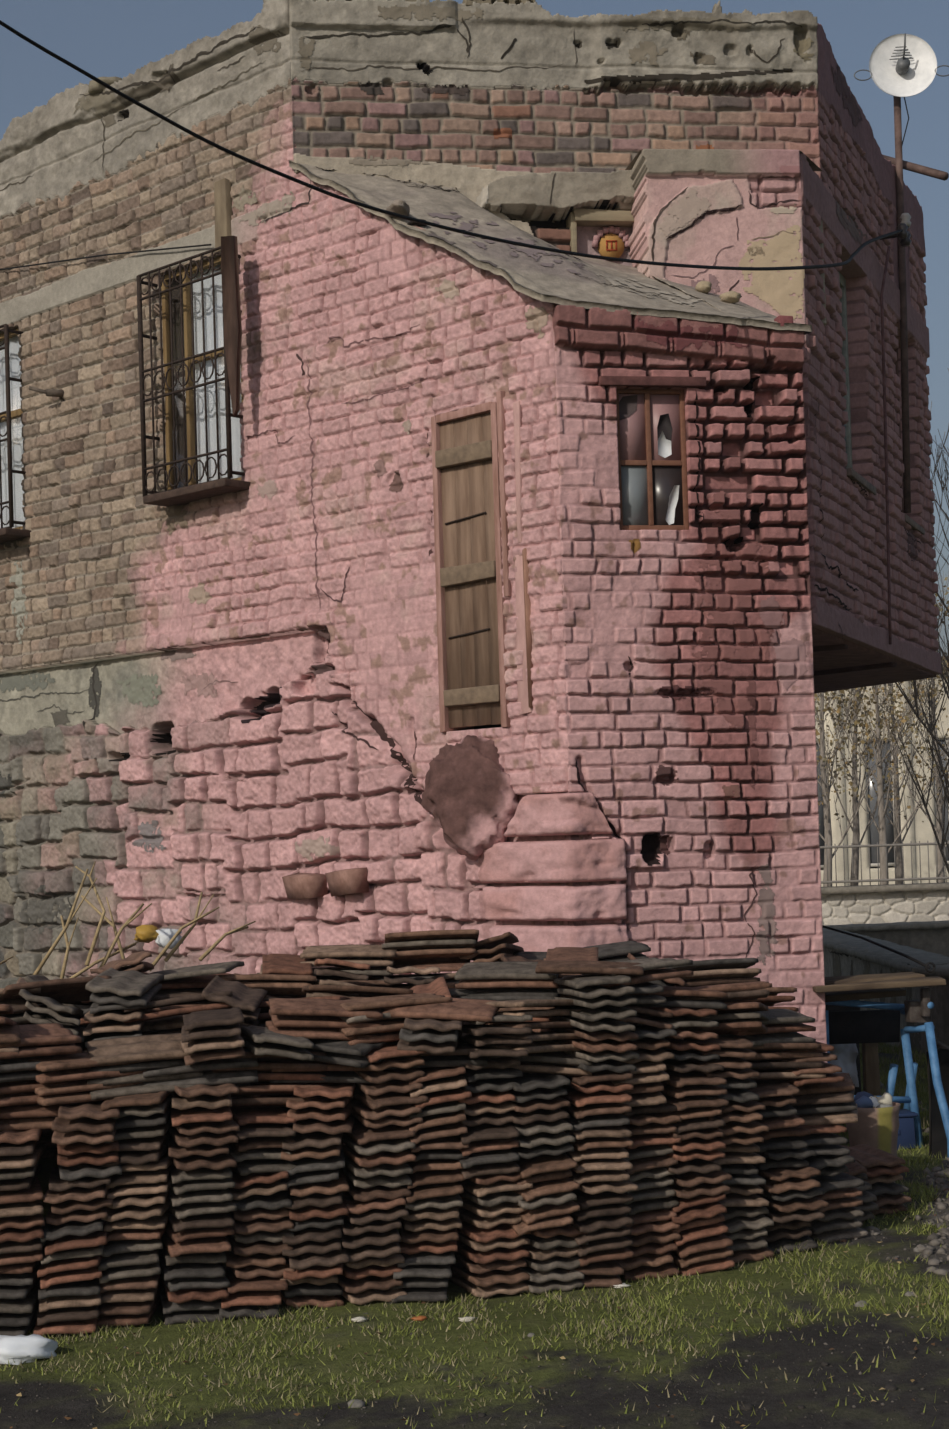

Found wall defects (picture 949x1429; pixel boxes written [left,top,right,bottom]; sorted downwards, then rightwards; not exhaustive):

crack [301,17,577,73]
crack [642,19,802,63]
crack [574,185,848,297]
spalling [311,626,335,675]
peeling [180,672,219,698]
spalling [50,710,70,727]
crack [332,699,423,807]
crack [576,757,586,791]
peeling [132,820,166,853]
crack [607,821,626,851]